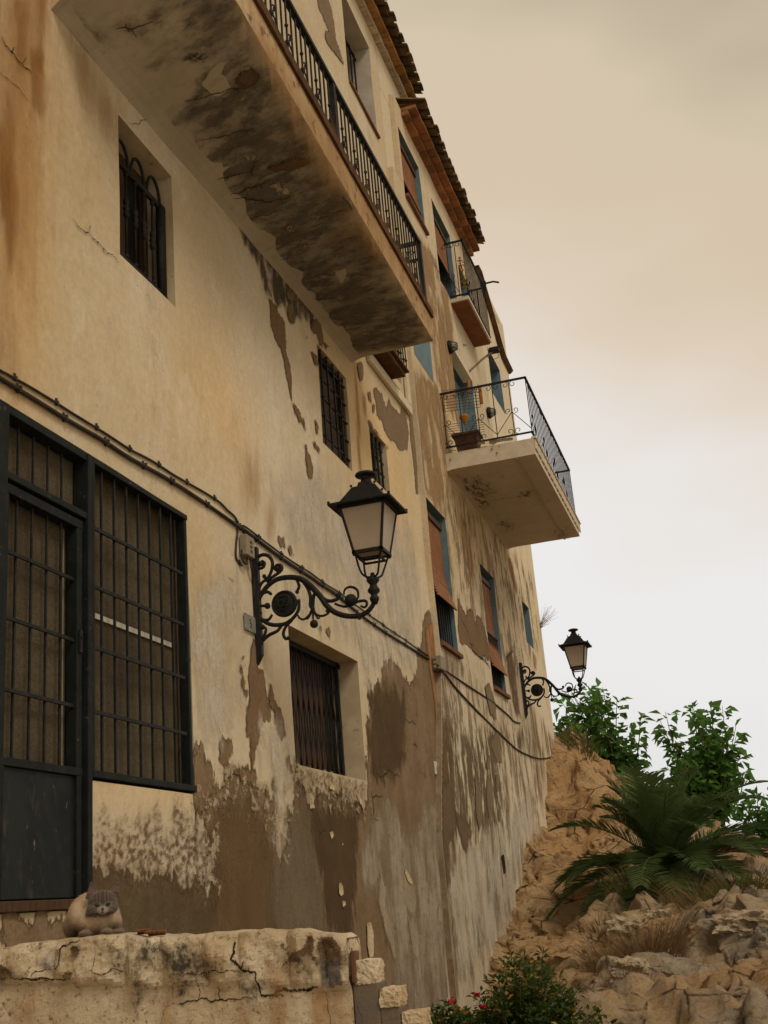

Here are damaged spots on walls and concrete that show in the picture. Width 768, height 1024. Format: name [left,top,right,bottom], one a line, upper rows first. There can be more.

crack [0,37,32,101]
damp [185,57,422,352]
peeling [262,289,320,481]
peeling [307,319,328,366]
peeling [358,239,463,509]
peeling [478,437,513,454]
peeling [458,599,490,661]
damp [93,477,544,1023]
peeling [93,611,504,1024]
peeling [0,910,80,983]
crack [13,940,127,981]
crack [161,942,331,1024]